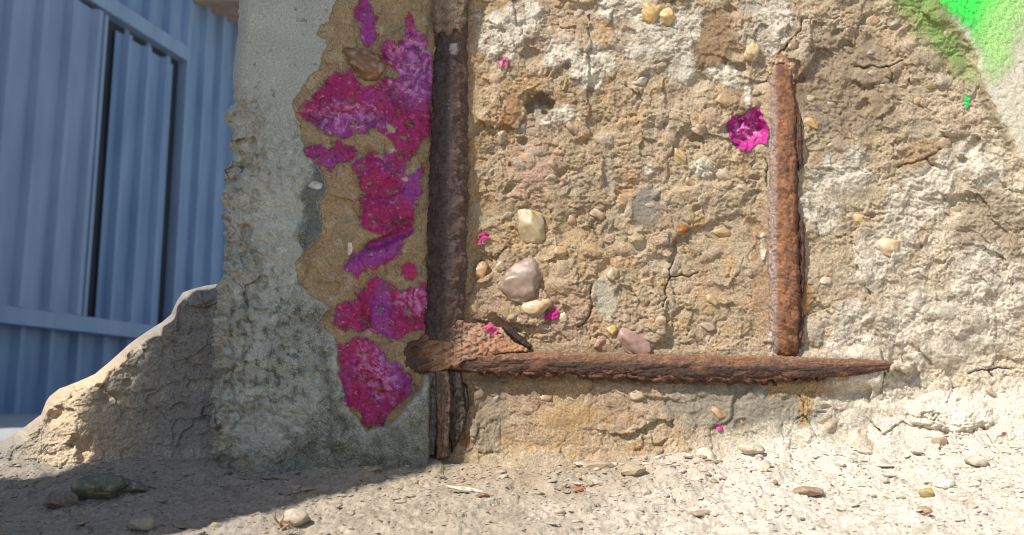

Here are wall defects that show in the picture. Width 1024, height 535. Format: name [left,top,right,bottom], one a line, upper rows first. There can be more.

rust [796,112,804,170]
spalling [292,0,1024,470]
crack [663,263,698,305]
rust [798,213,812,341]
rust [403,319,833,460]